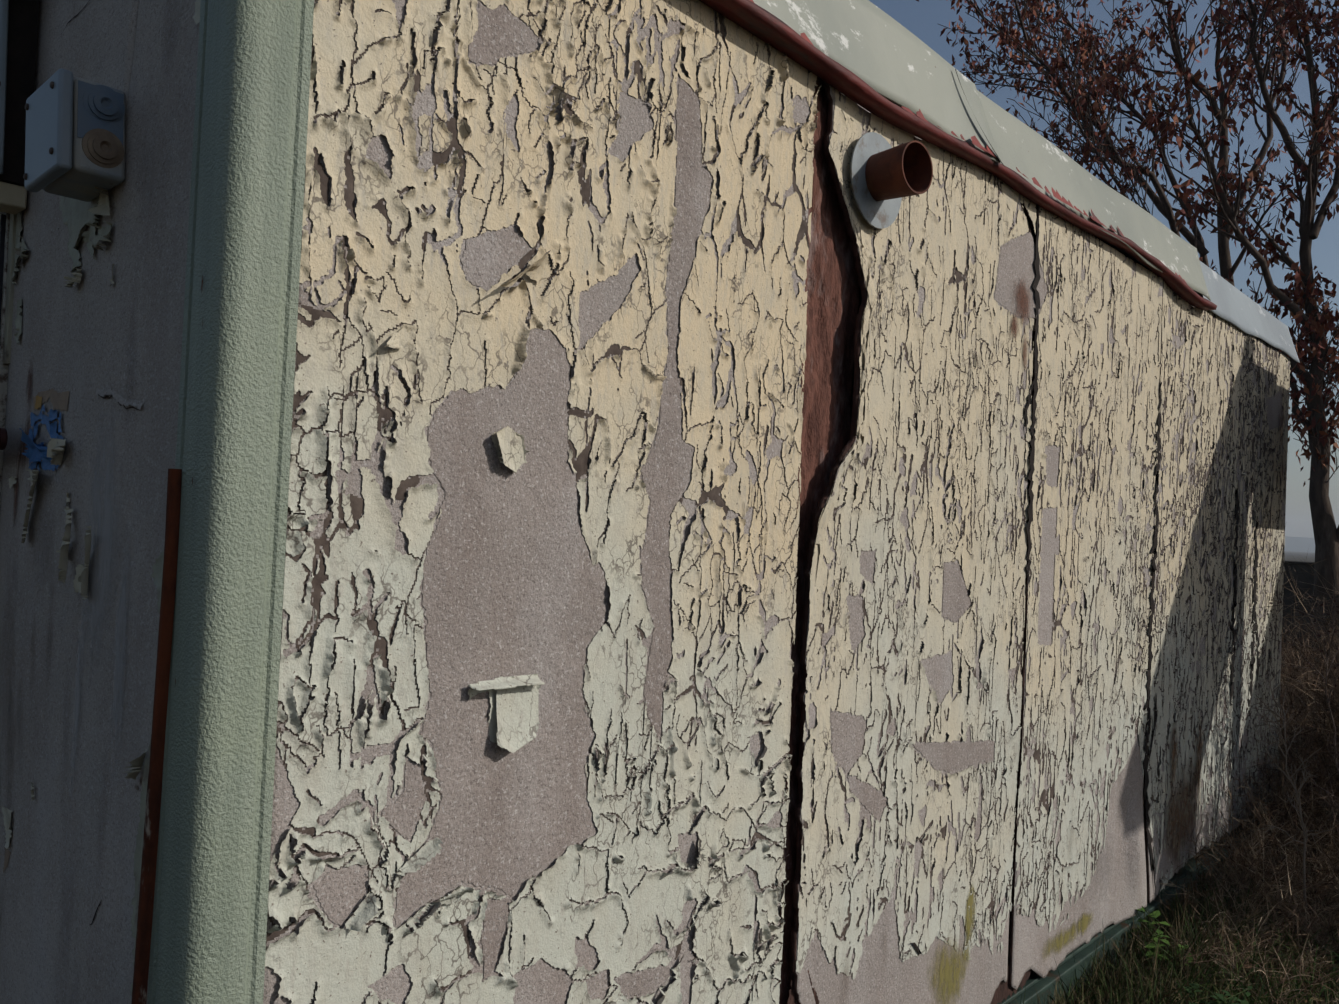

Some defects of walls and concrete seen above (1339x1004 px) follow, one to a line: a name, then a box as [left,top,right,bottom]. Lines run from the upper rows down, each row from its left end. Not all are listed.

peeling [58,187,112,288]
peeling [7,388,69,544]
peeling [151,551,164,614]
peeling [265,0,1291,1004]
crack [1025,211,1041,604]
crack [1143,381,1162,893]
peeling [122,739,151,966]